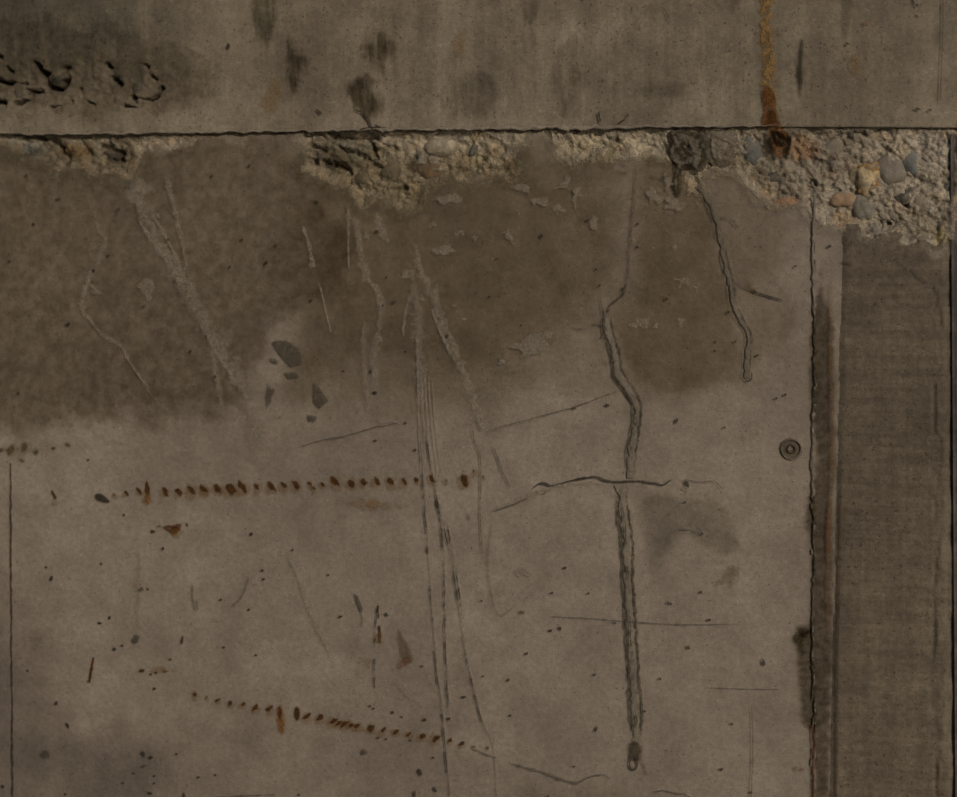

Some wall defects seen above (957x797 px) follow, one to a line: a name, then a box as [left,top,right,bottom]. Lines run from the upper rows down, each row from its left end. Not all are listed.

rust [761,0,787,159]
spalling [0,133,211,202]
spalling [288,127,957,260]
crack [686,204,783,382]
rust [114,482,150,504]
rust [163,475,447,496]
crack [303,357,451,553]
crack [467,170,724,796]
rust [193,693,489,749]
crack [371,608,379,688]
crack [429,575,482,772]